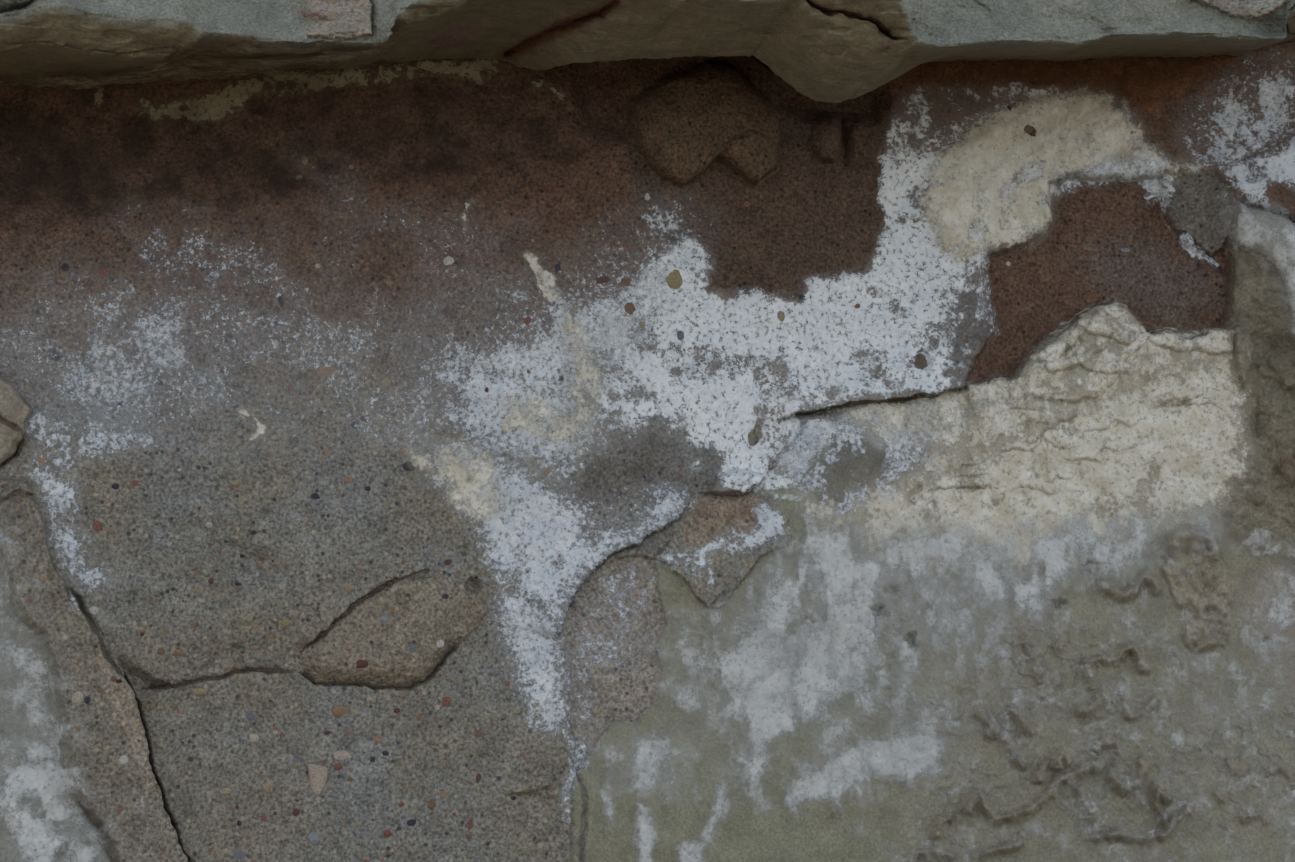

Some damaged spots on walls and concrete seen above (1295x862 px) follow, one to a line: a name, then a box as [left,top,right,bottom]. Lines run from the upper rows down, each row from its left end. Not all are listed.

leakage [0,39,504,222]
peeling [630,82,891,301]
leakage [1168,226,1220,267]
spalling [915,350,929,370]
spalling [942,175,1254,492]
crack [767,379,1017,474]
crack [565,524,671,617]
crack [746,539,792,578]
spalling [1159,529,1235,652]
leakage [0,538,105,862]
crack [62,582,398,862]
leakage [604,735,699,862]